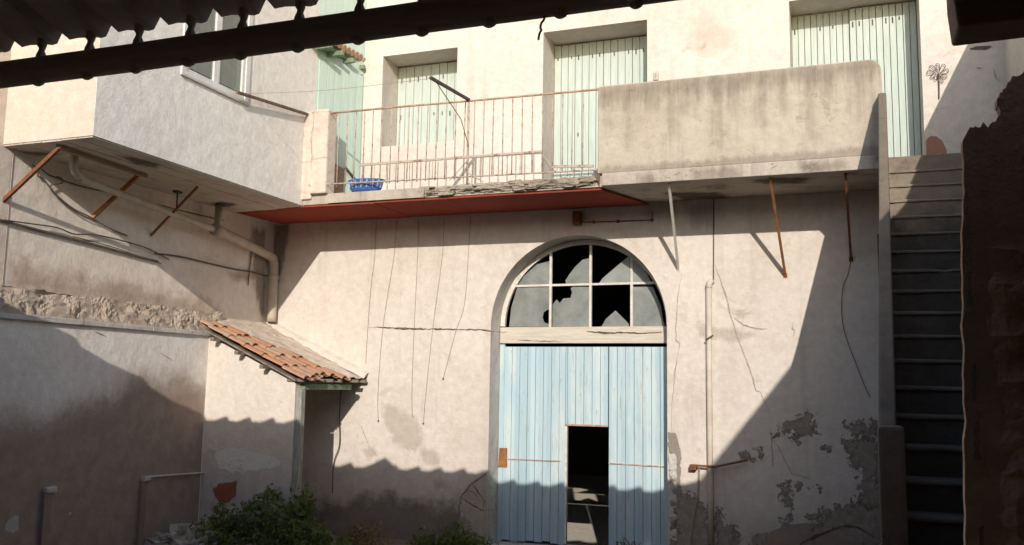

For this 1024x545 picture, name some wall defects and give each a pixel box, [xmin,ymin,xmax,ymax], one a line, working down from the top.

peeling [926,136,947,155]
crack [671,274,682,431]
crack [715,266,813,481]
peeling [213,444,285,503]
crack [458,473,492,515]
peeling [667,432,767,545]
rust [689,459,748,545]
peeling [738,409,881,545]